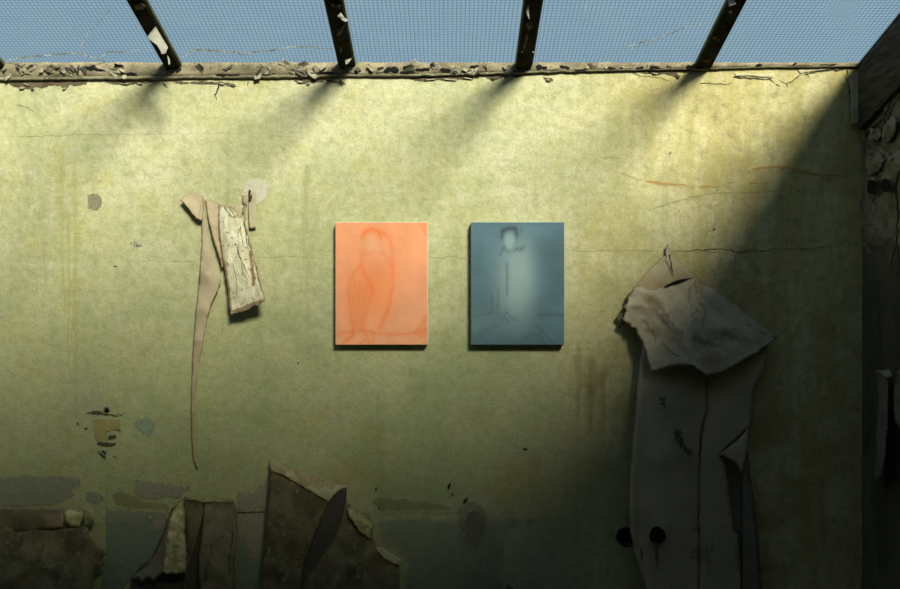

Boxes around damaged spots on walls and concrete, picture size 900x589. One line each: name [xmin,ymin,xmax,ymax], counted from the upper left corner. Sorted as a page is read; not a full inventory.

flaking render [1,63,151,90]
flaking render [253,46,527,85]
flaking render [635,64,696,78]
crack [700,67,851,109]
flaking render [869,116,899,144]
peeling [88,193,102,211]
crack [674,244,844,262]
spalling [97,429,120,447]
peeling [0,475,104,508]
peeling [149,498,188,574]
peeling [235,475,270,589]